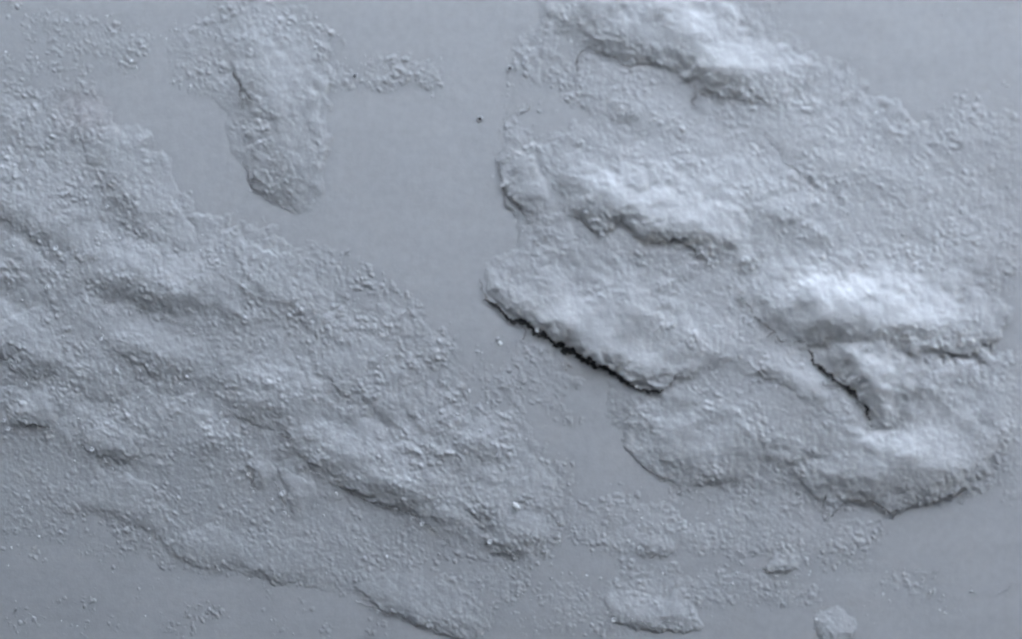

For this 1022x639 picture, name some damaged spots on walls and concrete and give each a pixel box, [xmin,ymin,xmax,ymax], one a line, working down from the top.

crack [741,297,872,427]